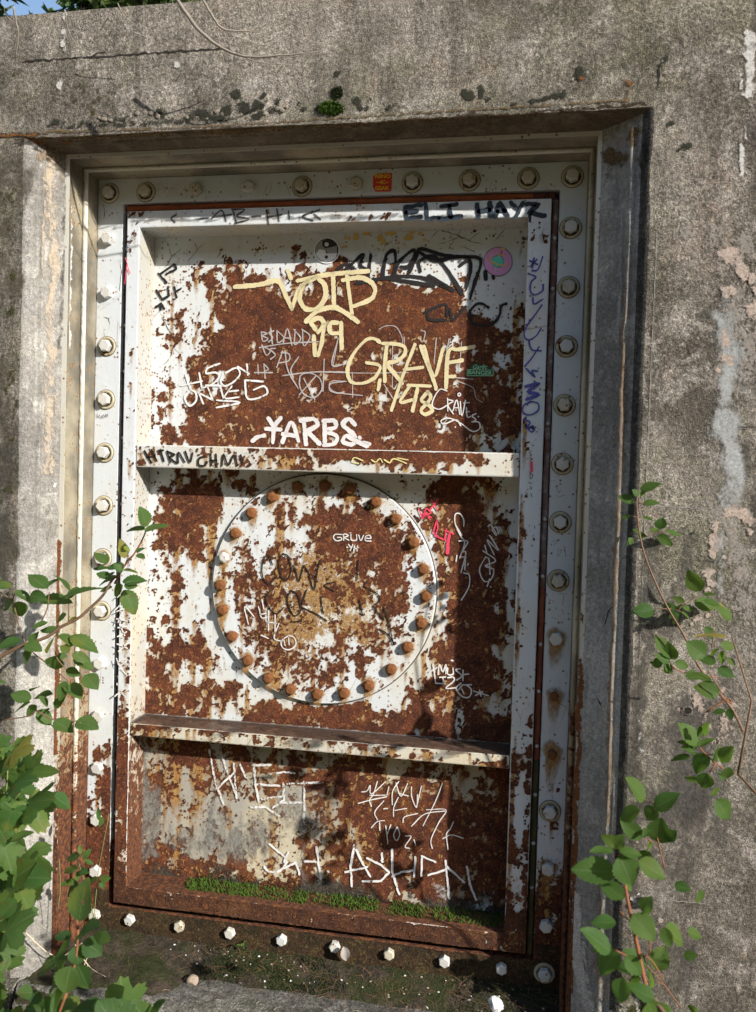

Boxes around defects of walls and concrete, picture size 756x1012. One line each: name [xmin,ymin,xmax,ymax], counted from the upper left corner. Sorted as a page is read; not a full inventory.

crack [23,48,220,62]
leakage [740,22,756,98]
leakage [739,120,756,176]
leakage [613,139,756,880]
corrosion [85,244,584,994]
leakage [569,891,602,1012]